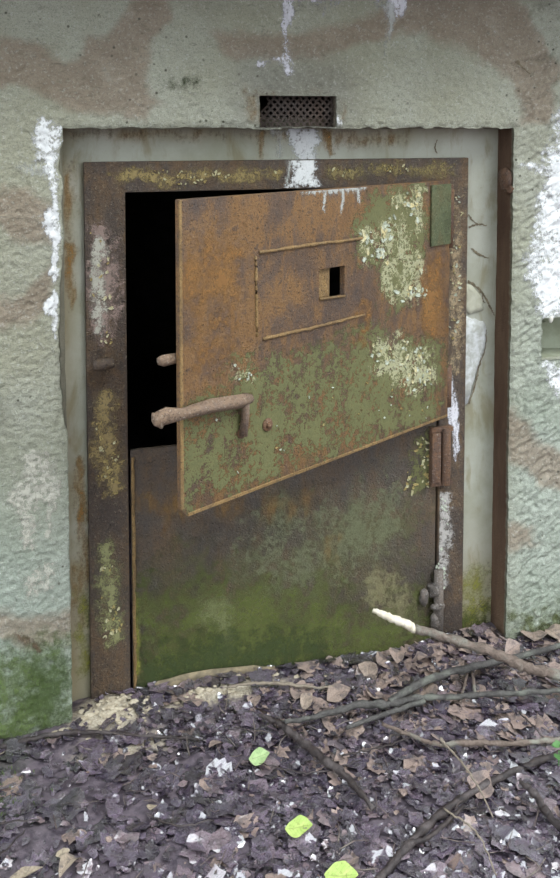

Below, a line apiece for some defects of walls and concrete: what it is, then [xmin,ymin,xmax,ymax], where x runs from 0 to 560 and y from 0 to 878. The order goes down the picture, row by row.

damp [277,0,300,76]
damp [376,0,407,34]
damp [24,116,63,339]
peeling [183,161,487,515]
peeling [436,492,453,589]